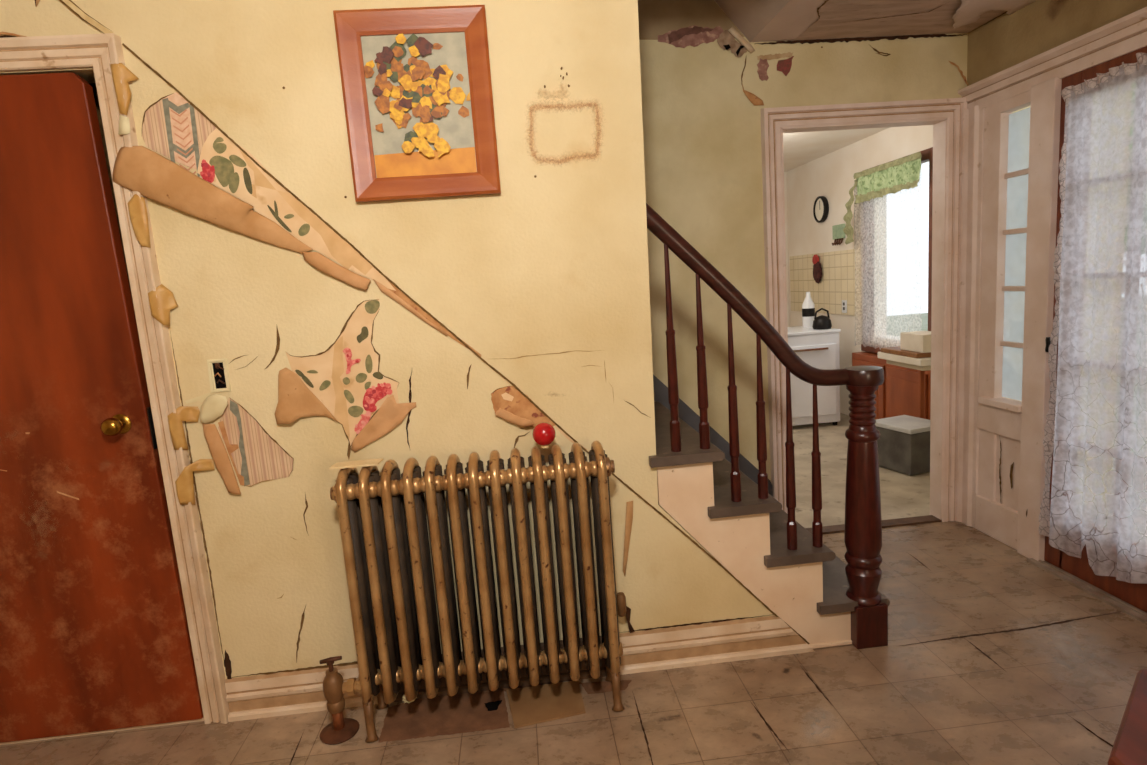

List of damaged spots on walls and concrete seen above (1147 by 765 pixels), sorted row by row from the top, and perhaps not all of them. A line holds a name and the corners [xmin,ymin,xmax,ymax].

spalling [658,25,794,81]
crack [60,0,651,454]
crack [996,435,1004,501]
crack [612,473,832,705]